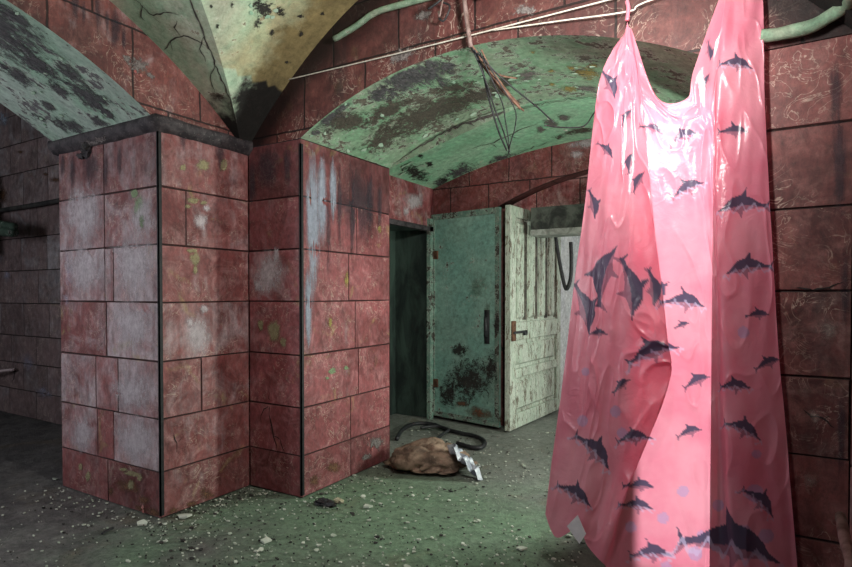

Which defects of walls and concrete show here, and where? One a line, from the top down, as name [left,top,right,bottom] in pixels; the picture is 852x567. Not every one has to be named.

crack [136,0,236,117]
damp [366,59,468,102]
damp [433,153,515,185]
damp [306,165,336,342]